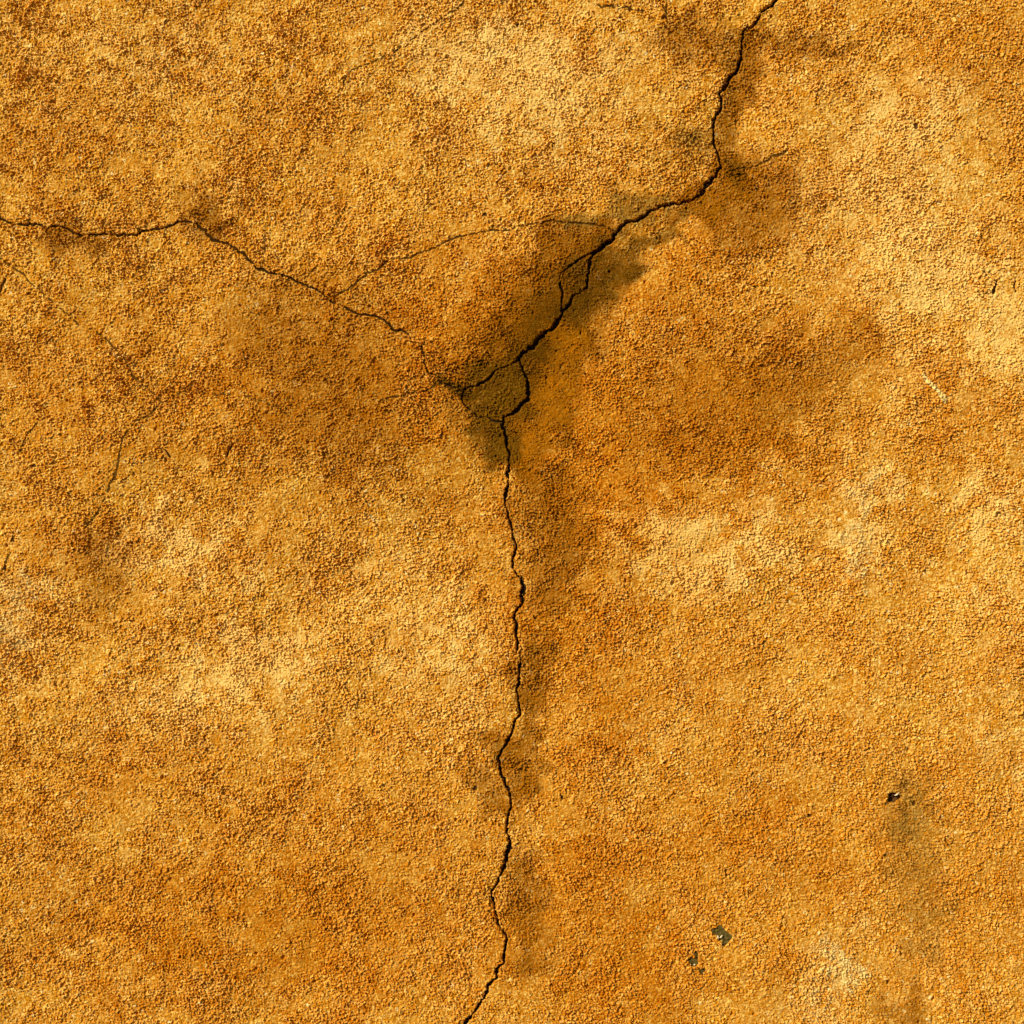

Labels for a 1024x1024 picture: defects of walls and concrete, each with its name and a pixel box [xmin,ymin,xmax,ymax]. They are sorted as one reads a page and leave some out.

leakage [437,211,685,471]
crack [0,0,788,1024]
spalling [688,951,705,975]
spalling [712,925,732,947]